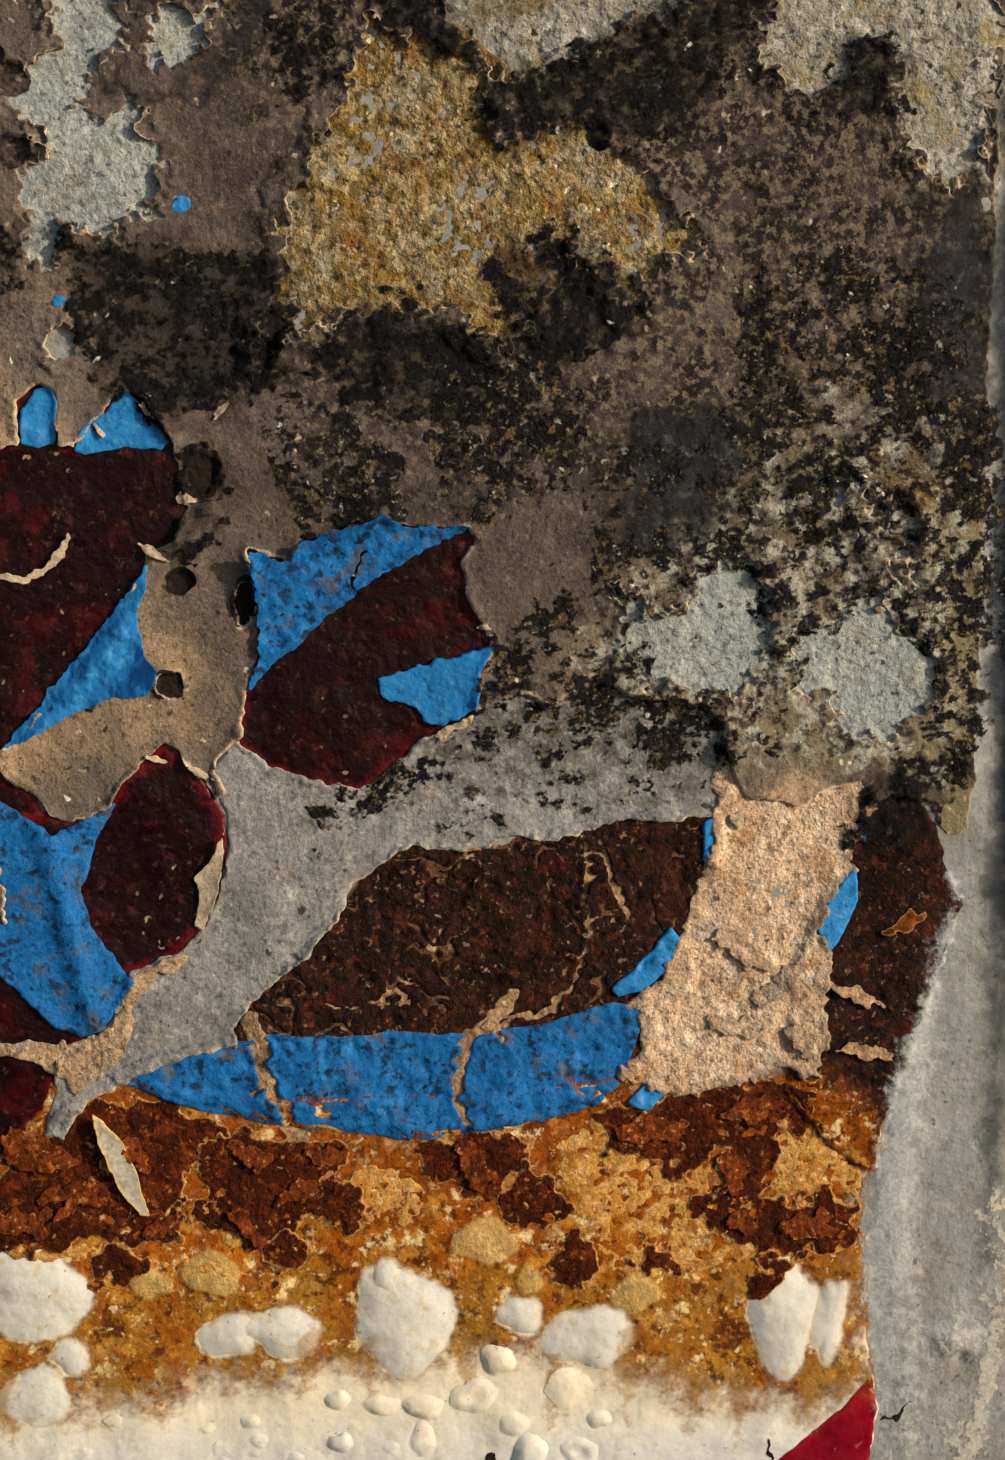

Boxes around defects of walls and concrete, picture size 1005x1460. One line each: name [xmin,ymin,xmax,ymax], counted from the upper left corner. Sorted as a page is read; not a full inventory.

spalling [0,0,227,272]
leakage [262,0,338,108]
leakage [464,0,779,158]
peeling [0,532,70,584]
spalling [138,543,197,595]
spalling [153,670,184,699]
leakage [54,217,1005,947]
peeling [194,833,224,930]
peeling [235,816,712,1041]
corrosion [0,1067,881,1420]
leakage [862,871,967,1405]
leakage [937,1185,1005,1460]